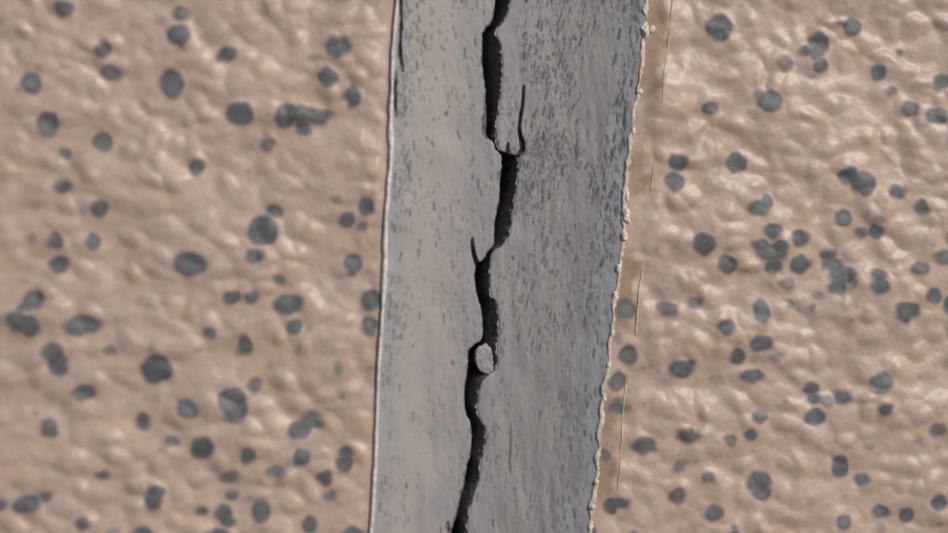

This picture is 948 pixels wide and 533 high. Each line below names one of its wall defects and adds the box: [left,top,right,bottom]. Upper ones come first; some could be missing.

crack [446,0,526,533]